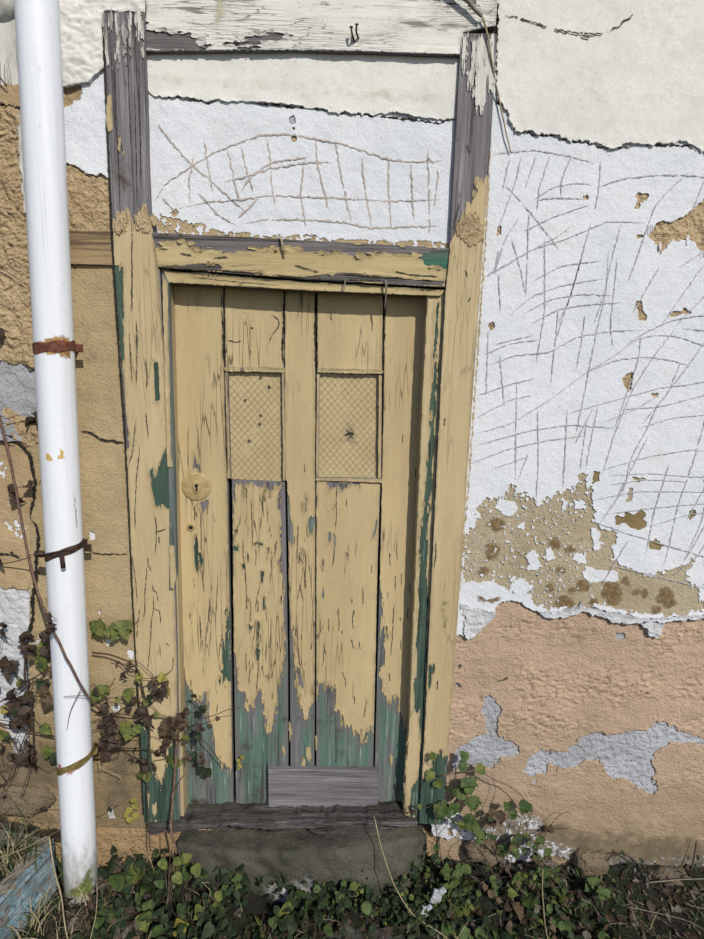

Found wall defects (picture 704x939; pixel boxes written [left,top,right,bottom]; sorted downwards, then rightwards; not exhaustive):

rust [39,336,70,357]
peeling [66,12,497,287]
flaking render [636,198,704,258]
crack [0,434,41,691]
peeling [0,587,41,755]
flaking render [140,301,704,863]